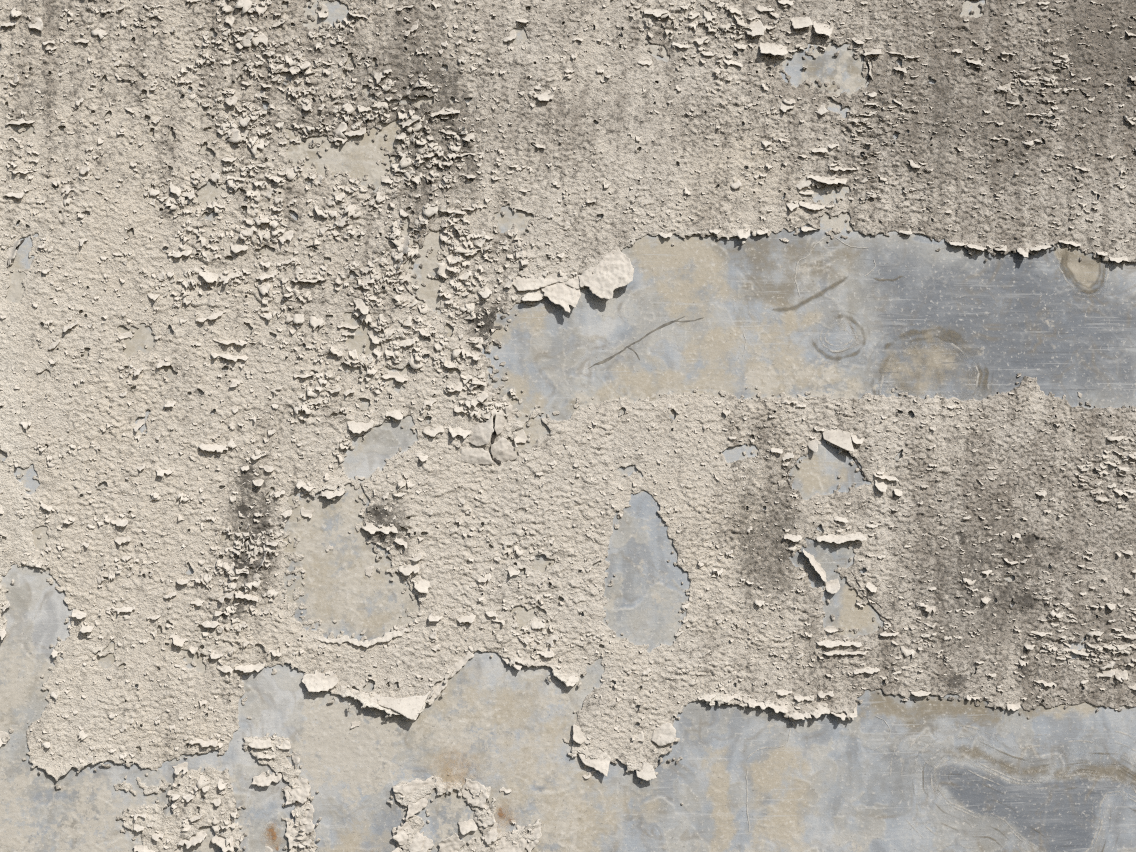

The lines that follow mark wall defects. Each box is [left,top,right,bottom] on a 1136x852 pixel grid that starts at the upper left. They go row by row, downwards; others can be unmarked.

peeling [643,8,669,17]
peeling [672,0,920,115]
peeling [939,48,984,67]
peeling [997,78,1058,117]
peeling [4,225,44,303]
peeling [199,259,296,285]
peeling [211,339,257,362]
peeling [228,165,1136,653]
peeling [198,443,228,453]
peeling [111,518,131,545]
peeling [784,516,900,674]
peeling [0,561,1136,852]